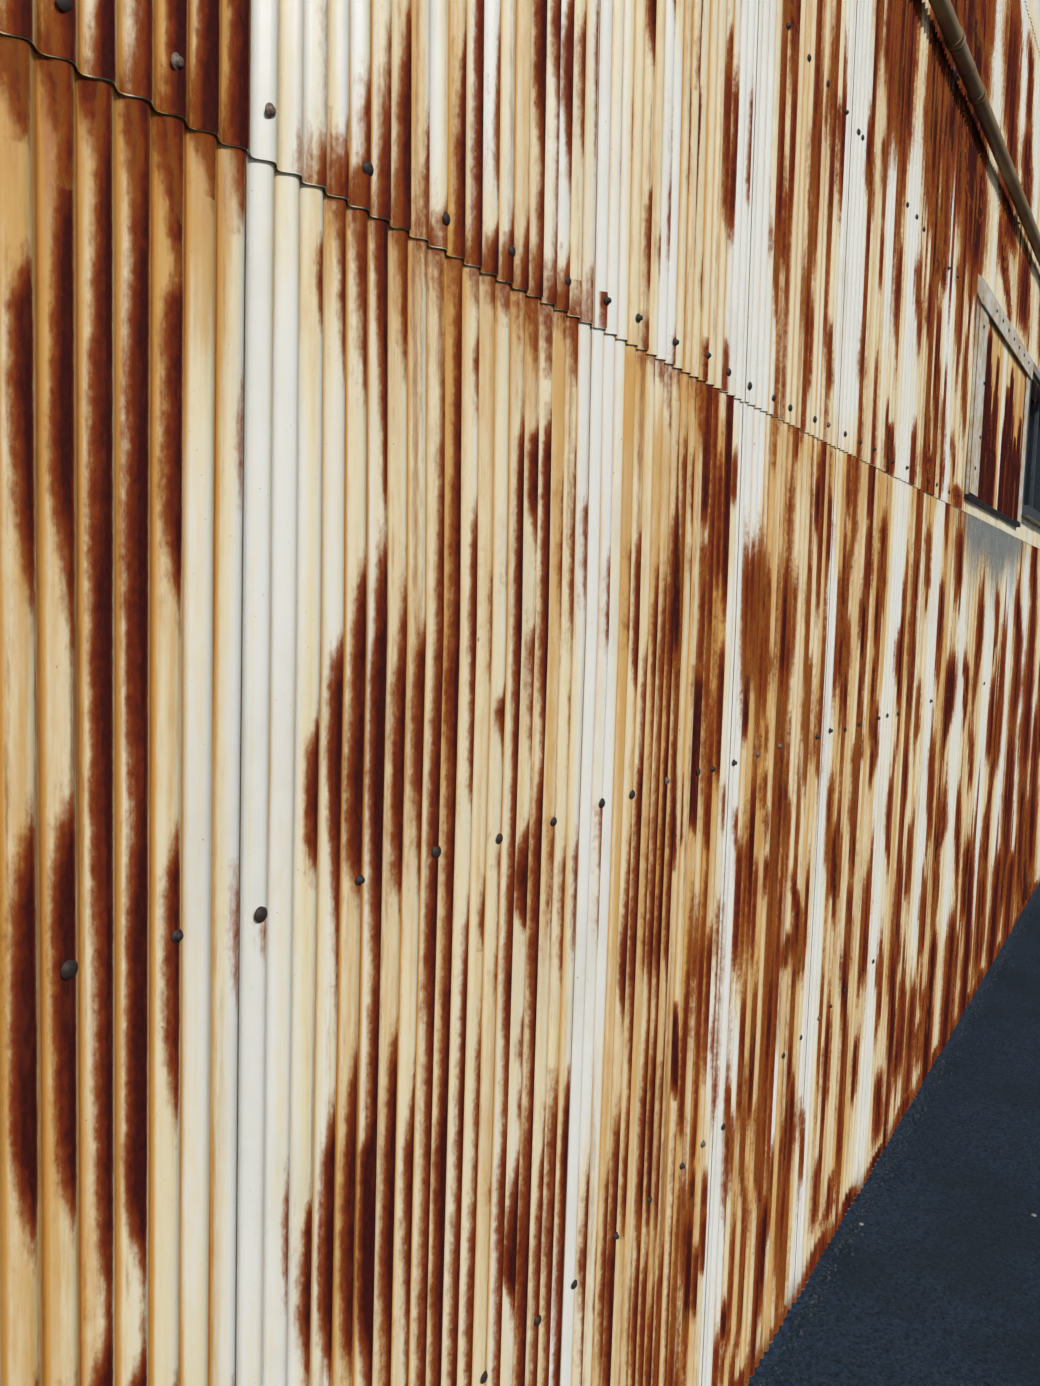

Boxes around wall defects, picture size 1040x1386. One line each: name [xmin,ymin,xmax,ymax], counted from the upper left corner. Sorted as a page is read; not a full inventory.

corrosion [0,0,250,1386]
corrosion [283,0,1040,1386]